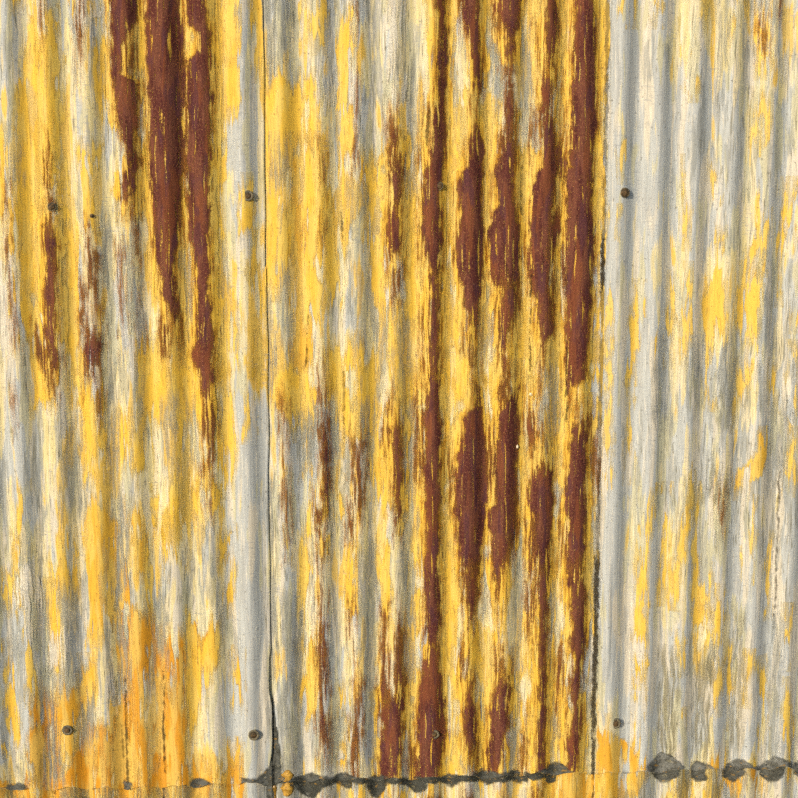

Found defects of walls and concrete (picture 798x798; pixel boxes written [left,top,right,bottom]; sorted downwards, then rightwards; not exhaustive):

rust [33,165,69,392]
rust [79,224,104,379]
rust [102,0,224,477]
peeling [0,0,426,798]
rust [344,439,367,536]
peeling [443,78,503,252]
peeling [441,540,506,702]
rust [351,0,606,781]
peeling [508,0,624,458]
peeling [633,464,766,711]
peeling [703,179,798,410]
peeling [531,722,648,798]